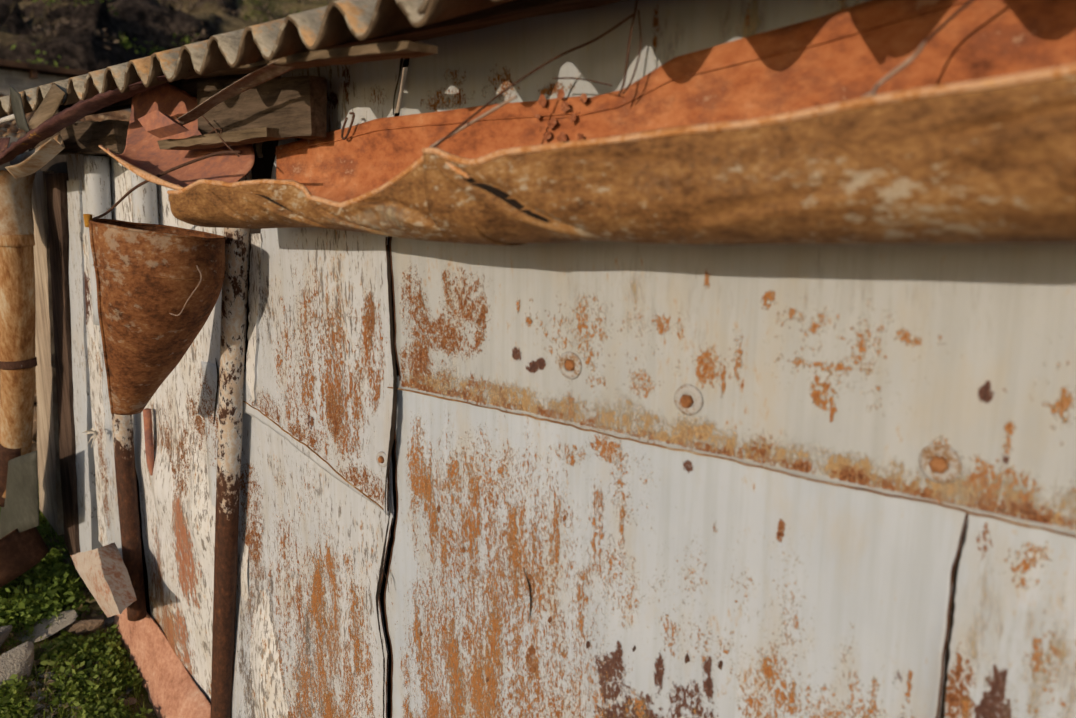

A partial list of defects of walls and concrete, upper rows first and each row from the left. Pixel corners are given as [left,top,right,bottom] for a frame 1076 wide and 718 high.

crack [376,245,397,718]
crack [939,519,968,718]